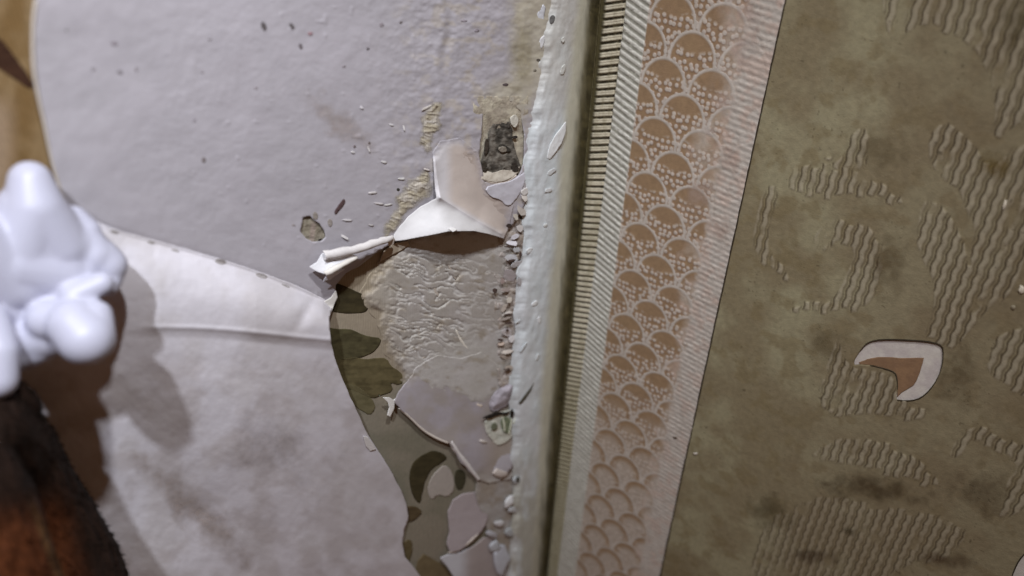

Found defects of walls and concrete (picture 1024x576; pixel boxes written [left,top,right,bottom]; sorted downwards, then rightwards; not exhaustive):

peeling [537,5,555,24]
peeling [420,103,442,152]
peeling [545,122,566,192]
peeling [292,199,352,242]
peeling [368,168,432,237]
spalling [473,83,534,576]